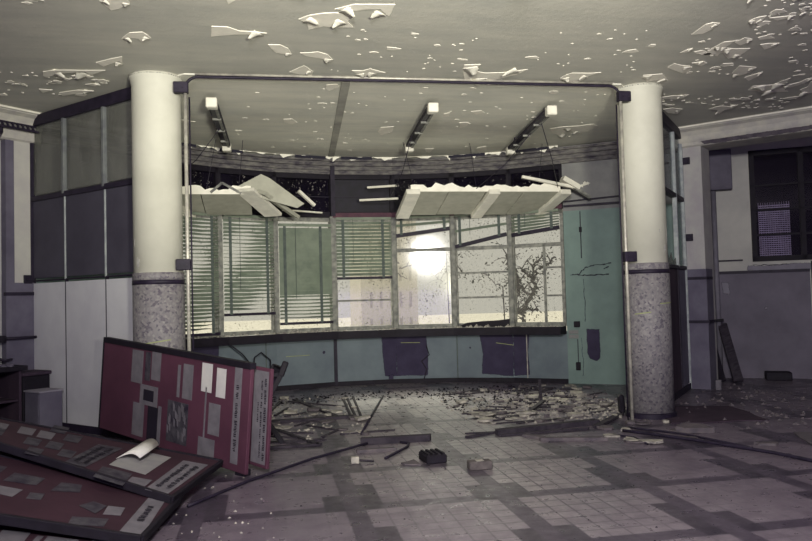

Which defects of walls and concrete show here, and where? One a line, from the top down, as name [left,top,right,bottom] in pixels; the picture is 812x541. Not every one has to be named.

peeling [0,56,123,97]
peeling [99,0,130,11]
peeling [122,32,151,43]
peeling [211,26,338,76]
peeling [299,4,395,41]
peeling [352,68,385,78]
peeling [451,38,528,96]
peeling [641,0,812,115]